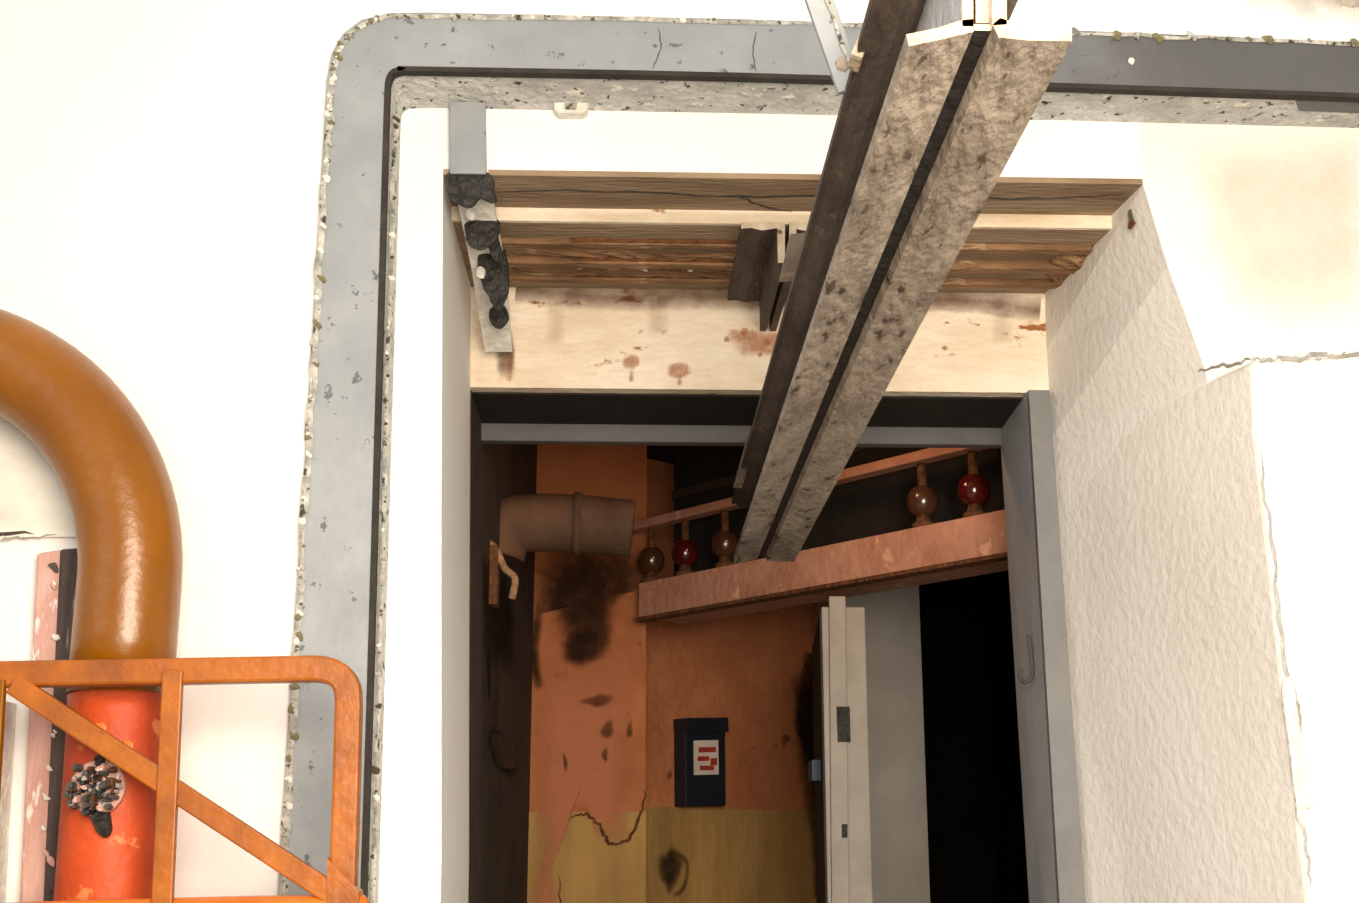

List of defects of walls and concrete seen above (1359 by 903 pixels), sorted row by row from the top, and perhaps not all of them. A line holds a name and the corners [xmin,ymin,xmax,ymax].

rust [725,331,775,356]
crack [0,531,55,540]